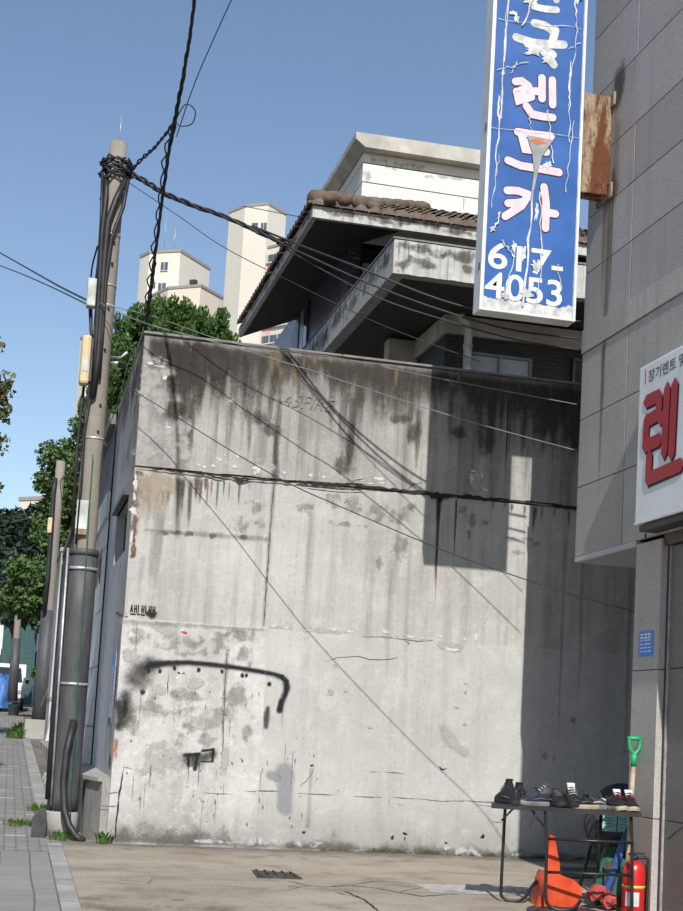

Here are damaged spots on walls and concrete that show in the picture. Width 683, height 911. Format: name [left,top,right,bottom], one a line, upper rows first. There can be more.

damp [123,242,581,472]